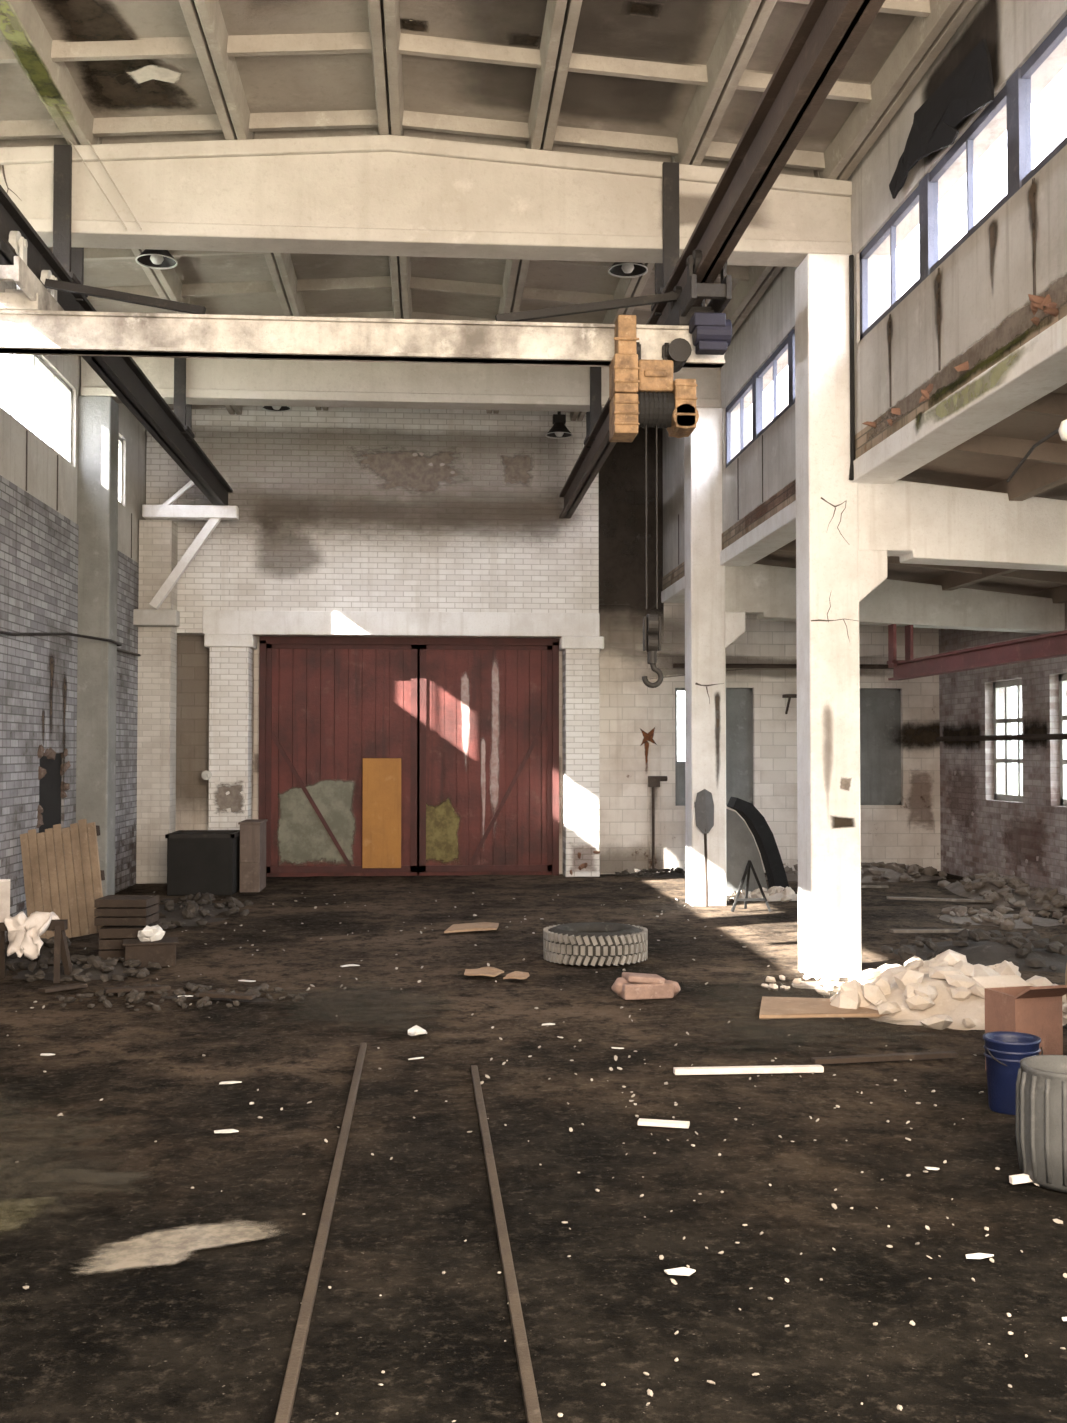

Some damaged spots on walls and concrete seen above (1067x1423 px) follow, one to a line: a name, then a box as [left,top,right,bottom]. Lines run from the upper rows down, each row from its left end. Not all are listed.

water stain [9,44,65,103]
water stain [40,0,137,42]
water stain [79,59,188,109]
peeling [128,65,181,83]
water stain [923,0,999,102]
water stain [1028,182,1037,257]
water stain [989,220,997,287]
water stain [934,272,942,347]
spalling [862,274,1067,438]
water stain [930,318,1051,405]
peeling [501,455,533,486]
water stain [893,722,981,749]